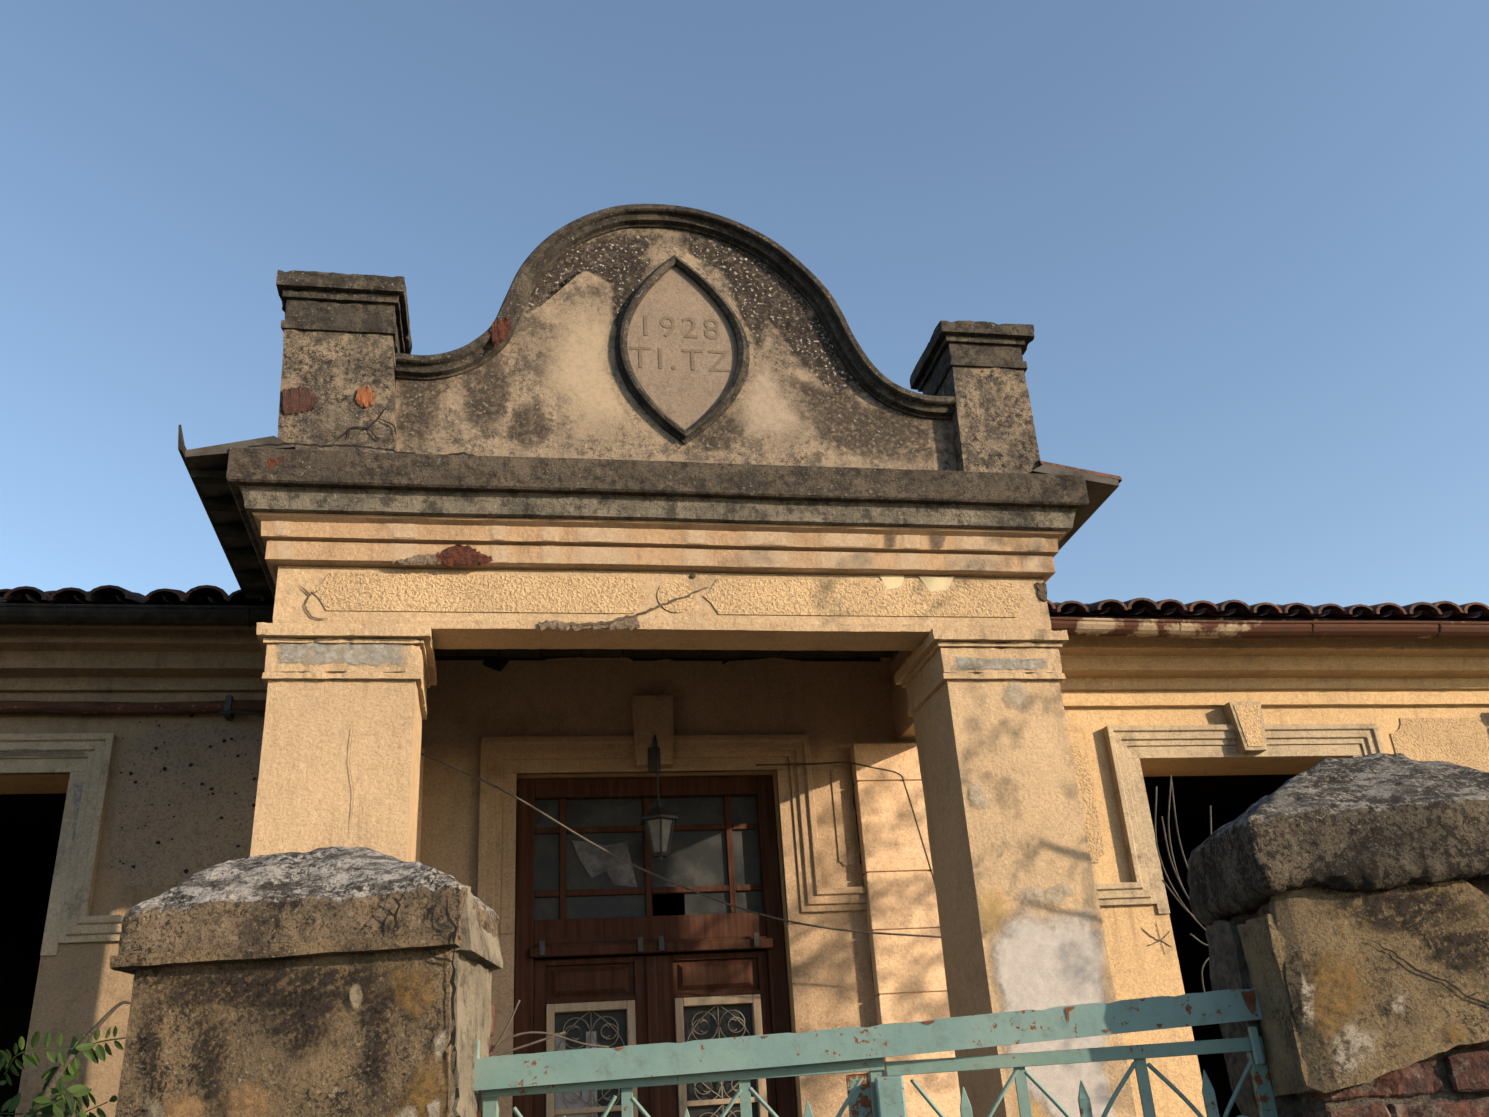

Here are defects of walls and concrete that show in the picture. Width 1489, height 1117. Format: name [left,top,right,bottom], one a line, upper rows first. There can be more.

spalling [490,316,511,348]
spalling [282,386,318,415]
spalling [355,386,375,408]
spalling [392,544,493,567]
crack [300,586,325,620]
crack [538,587,708,626]
peeling [279,642,405,666]
peeling [952,656,1047,707]
crack [1369,939,1489,1005]
water stain [145,963,443,1117]